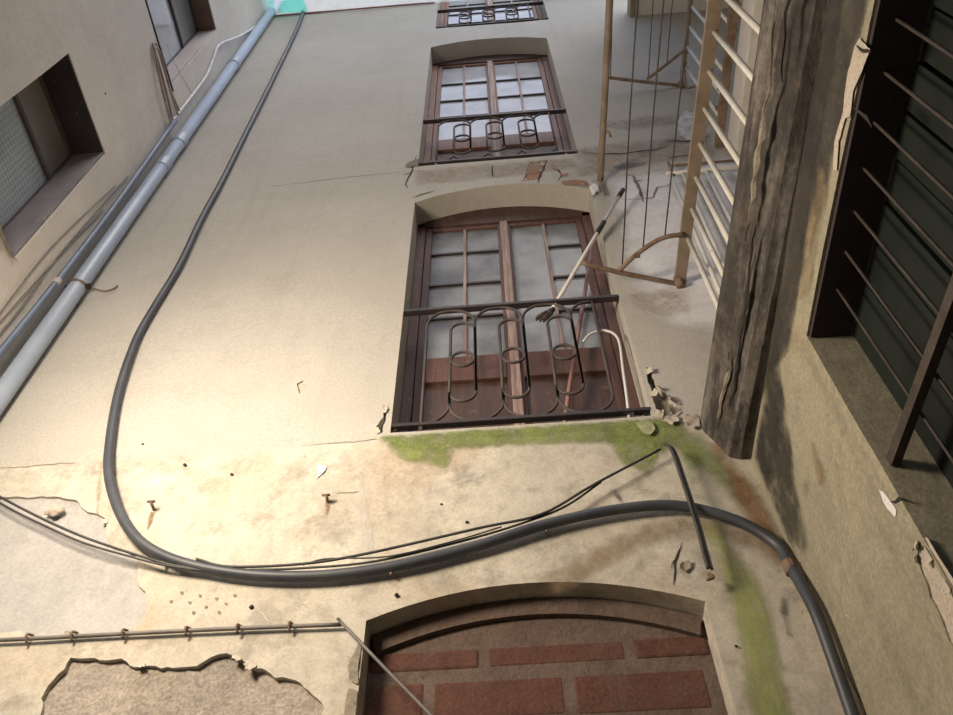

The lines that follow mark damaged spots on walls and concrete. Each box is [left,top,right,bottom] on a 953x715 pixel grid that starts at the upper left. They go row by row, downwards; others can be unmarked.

crack [717,0,791,429]
leakage [757,0,866,545]
spalling [636,366,681,435]
peeling [0,495,148,636]
peeling [912,537,953,643]